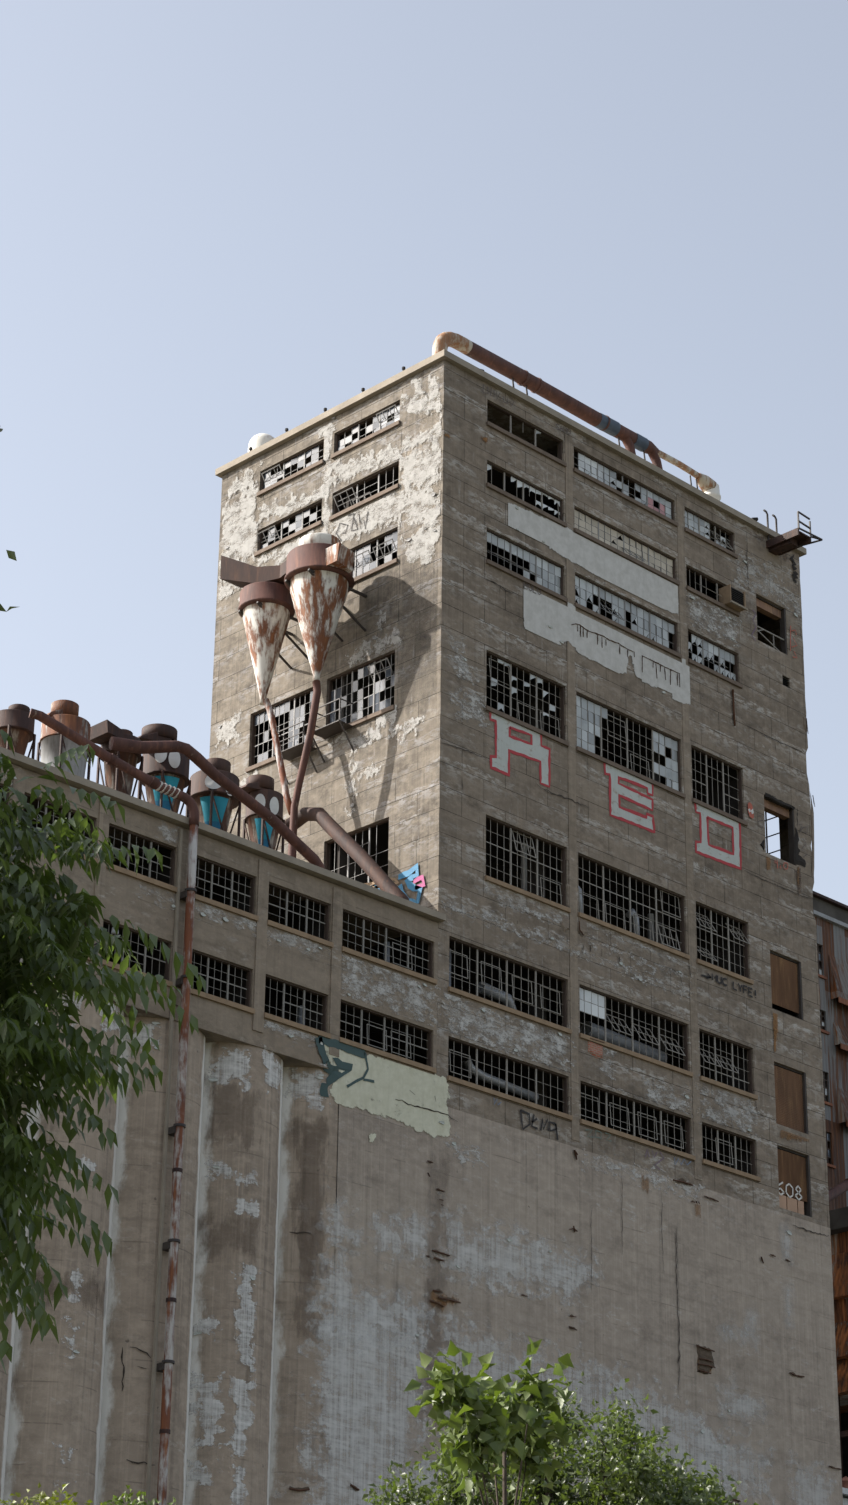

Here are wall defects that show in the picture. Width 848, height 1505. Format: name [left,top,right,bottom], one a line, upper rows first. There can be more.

peeling [508,503,741,646]
peeling [524,586,691,705]
peeling [208,1020,488,1169]
peeling [643,1079,756,1132]
peeling [204,1161,260,1218]
peeling [573,1150,719,1207]
peeling [289,1160,774,1505]